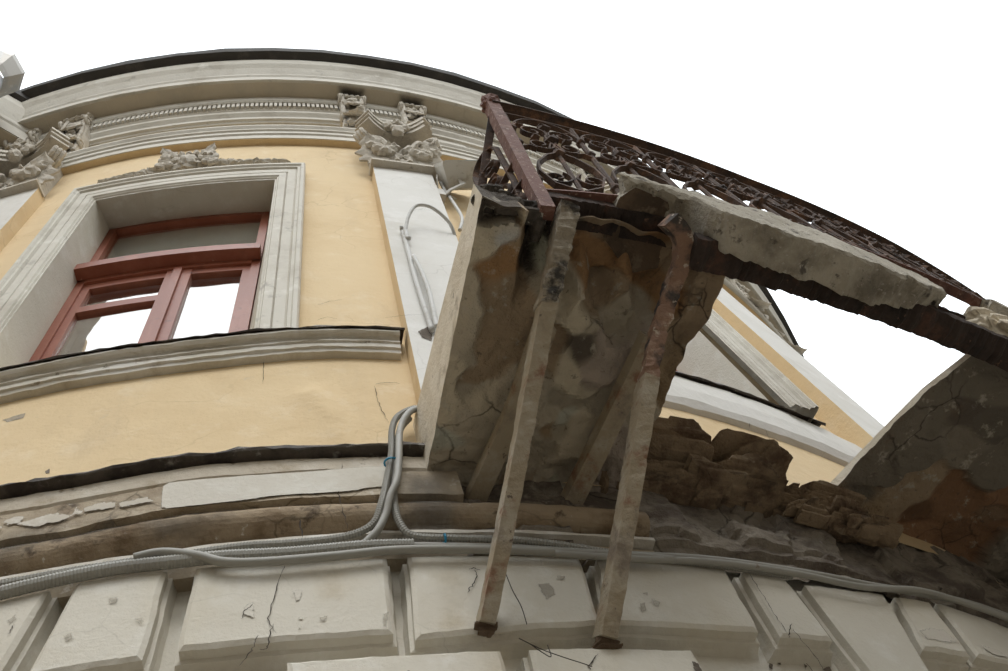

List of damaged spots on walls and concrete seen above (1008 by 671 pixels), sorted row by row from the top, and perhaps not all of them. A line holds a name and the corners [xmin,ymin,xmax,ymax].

spalling [471,183,546,242]
spalling [618,173,947,309]
spalling [418,327,432,340]
spalling [647,416,793,480]
peeling [0,466,401,528]
flaking render [461,483,503,503]
flaking render [520,480,618,509]
spalling [800,480,867,506]
flaking render [639,490,1008,628]
crack [240,566,285,665]